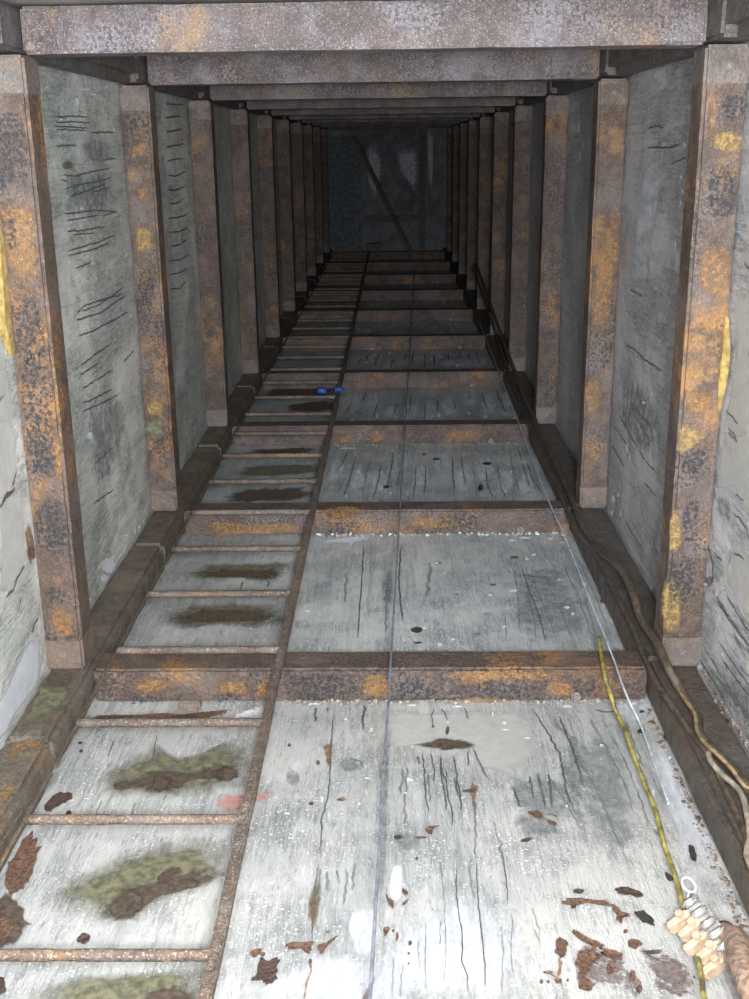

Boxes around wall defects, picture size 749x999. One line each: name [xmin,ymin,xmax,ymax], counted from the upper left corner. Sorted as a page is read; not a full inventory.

corrosion [11,295,62,478]
crack [726,411,737,442]
crack [0,475,16,507]
crack [6,566,38,633]
corrosion [25,500,68,563]
corrosion [663,496,699,630]
crack [704,493,749,656]
corrosion [93,679,268,719]
corrosion [44,792,73,814]
corrosion [417,710,488,854]
corrosion [0,831,42,948]
corrosion [309,885,320,923]